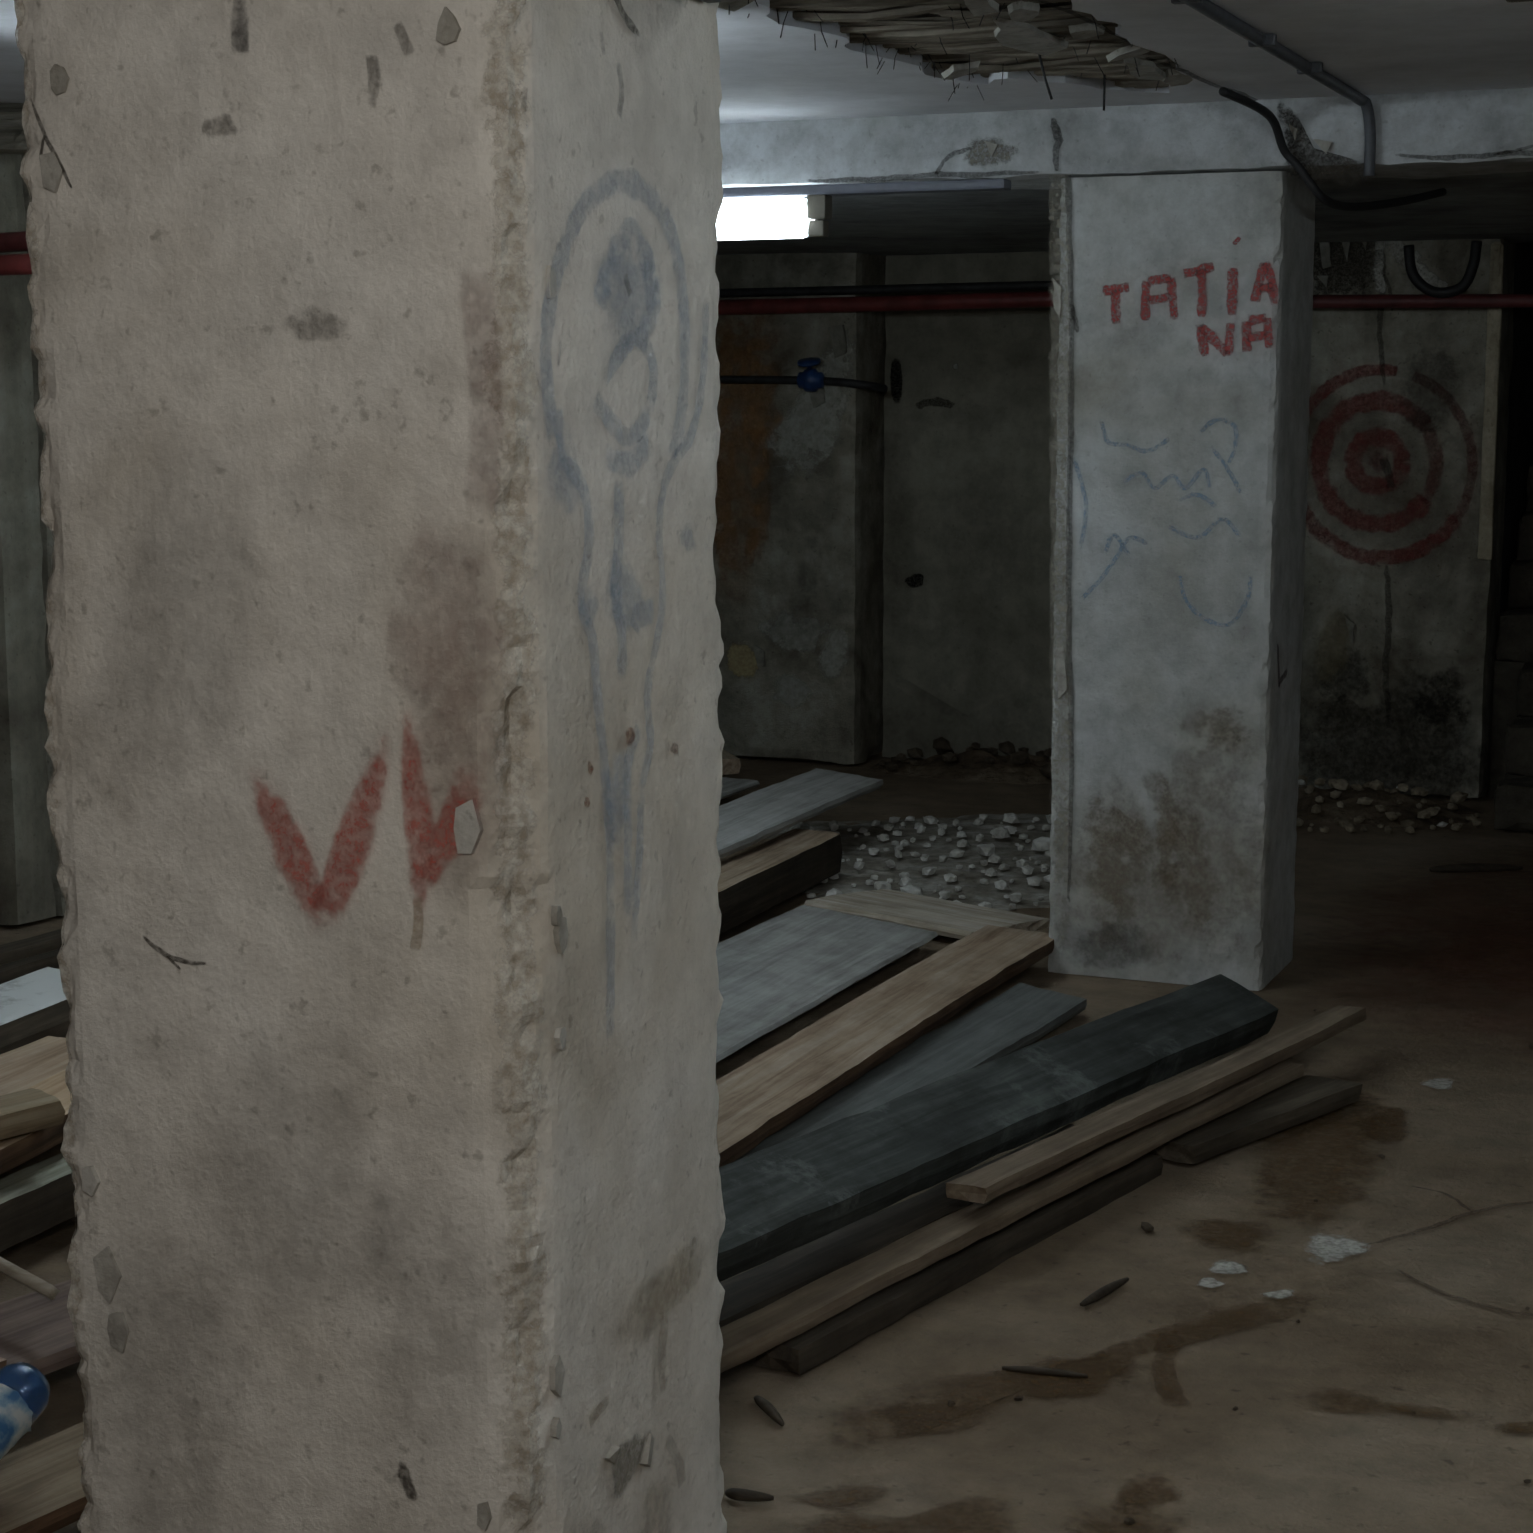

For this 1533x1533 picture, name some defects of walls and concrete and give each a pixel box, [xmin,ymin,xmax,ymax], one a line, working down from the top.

spalling [614,0,638,33]
spalling [718,0,1193,111]
leakage [1300,655,1482,795]
leakage [1185,1093,1406,1248]
crack [1378,1187,1533,1316]
leakage [835,1297,1302,1442]